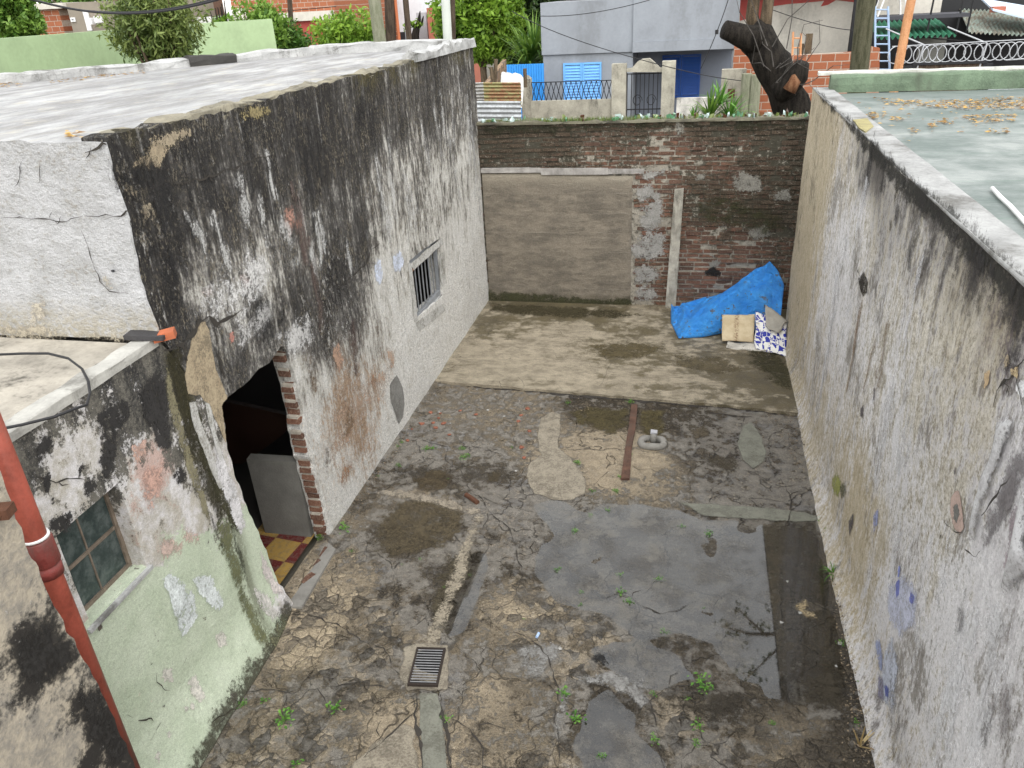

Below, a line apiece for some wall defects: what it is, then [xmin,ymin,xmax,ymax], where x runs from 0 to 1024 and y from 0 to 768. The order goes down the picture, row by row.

crack [5,210,133,293]
crack [85,142,107,158]
damp [113,138,313,355]
damp [234,101,352,311]
damp [808,93,1024,420]
peeling [325,351,394,472]
damp [44,472,73,538]
damp [78,348,292,768]
peeling [162,572,224,636]
crack [402,433,538,602]
crack [218,614,417,757]
crack [453,631,575,768]